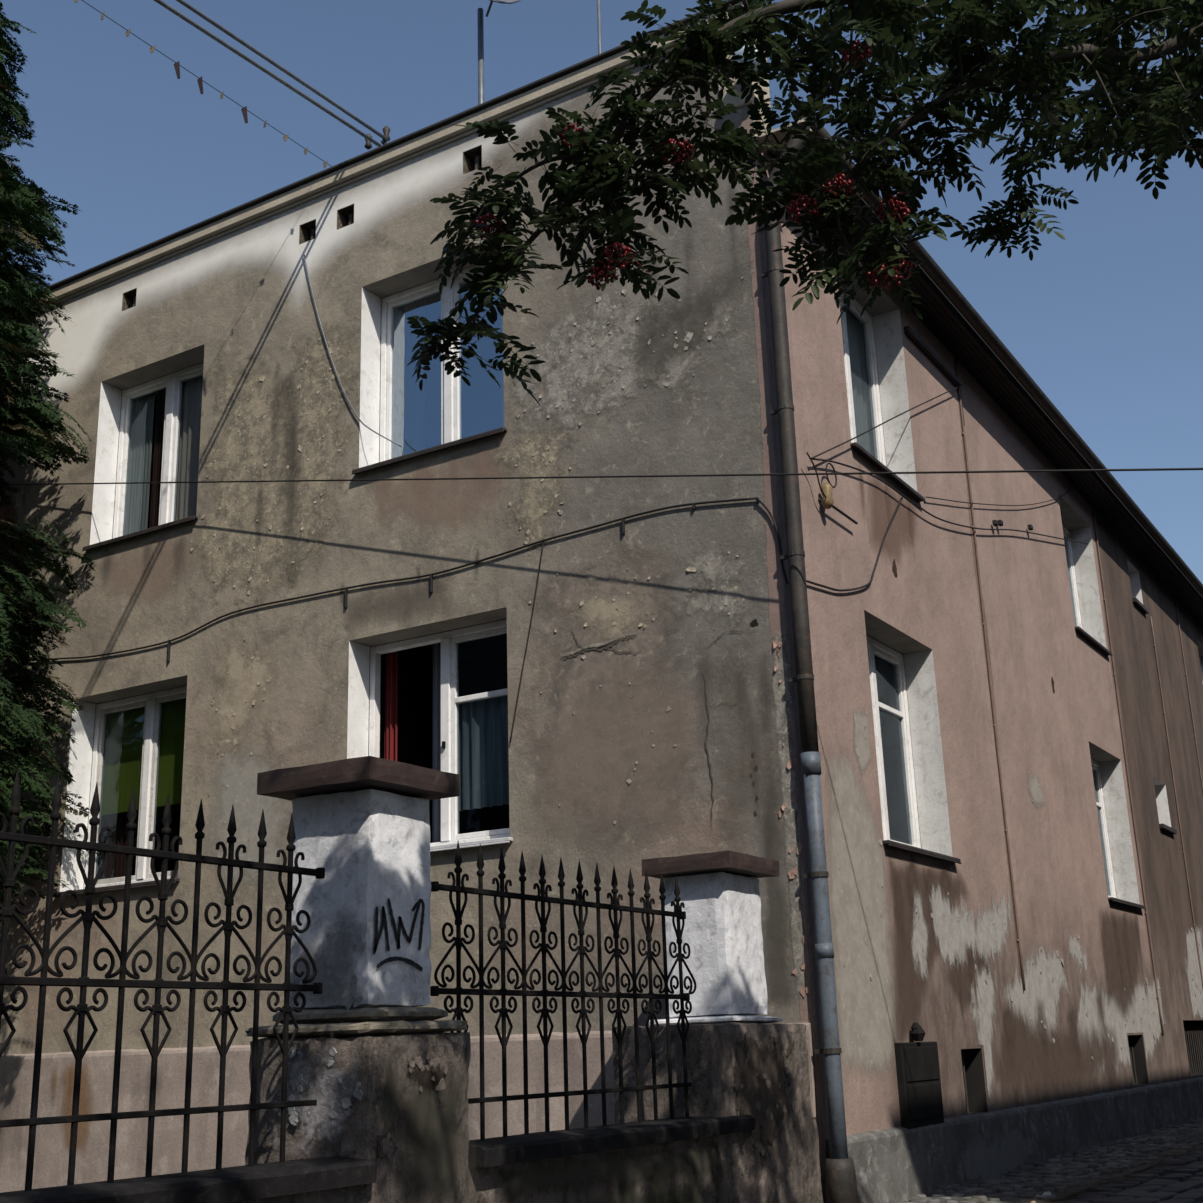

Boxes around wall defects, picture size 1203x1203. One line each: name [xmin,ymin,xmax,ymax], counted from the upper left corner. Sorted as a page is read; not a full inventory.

crack [560,628,639,659]
crack [701,630,753,830]
peeling [772,635,811,999]
flaking render [912,886,1166,1098]
flaking render [1184,927,1203,1018]
spalling [273,1047,363,1153]